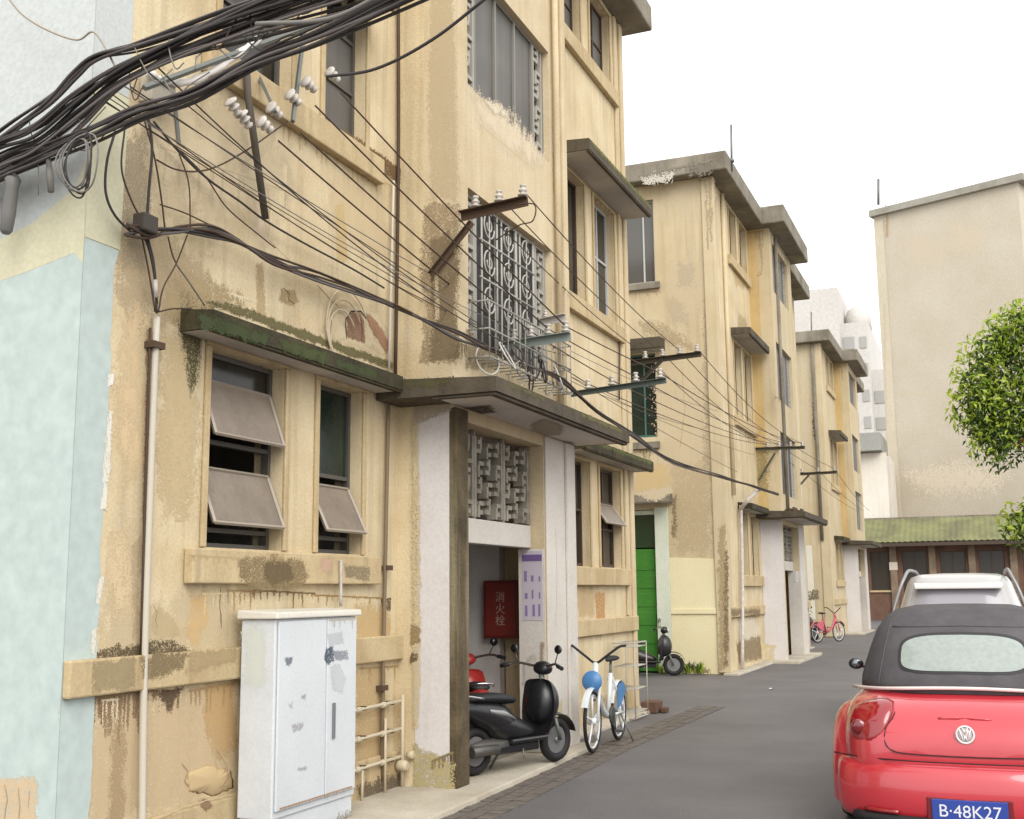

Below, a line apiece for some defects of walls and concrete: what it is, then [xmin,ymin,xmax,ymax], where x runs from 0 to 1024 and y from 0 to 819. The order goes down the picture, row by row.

damp [639,159,714,250]
spalling [318,303,393,358]
damp [433,271,441,322]
damp [114,230,299,525]
damp [635,254,776,675]
damp [88,534,315,819]
spalling [0,775,40,819]